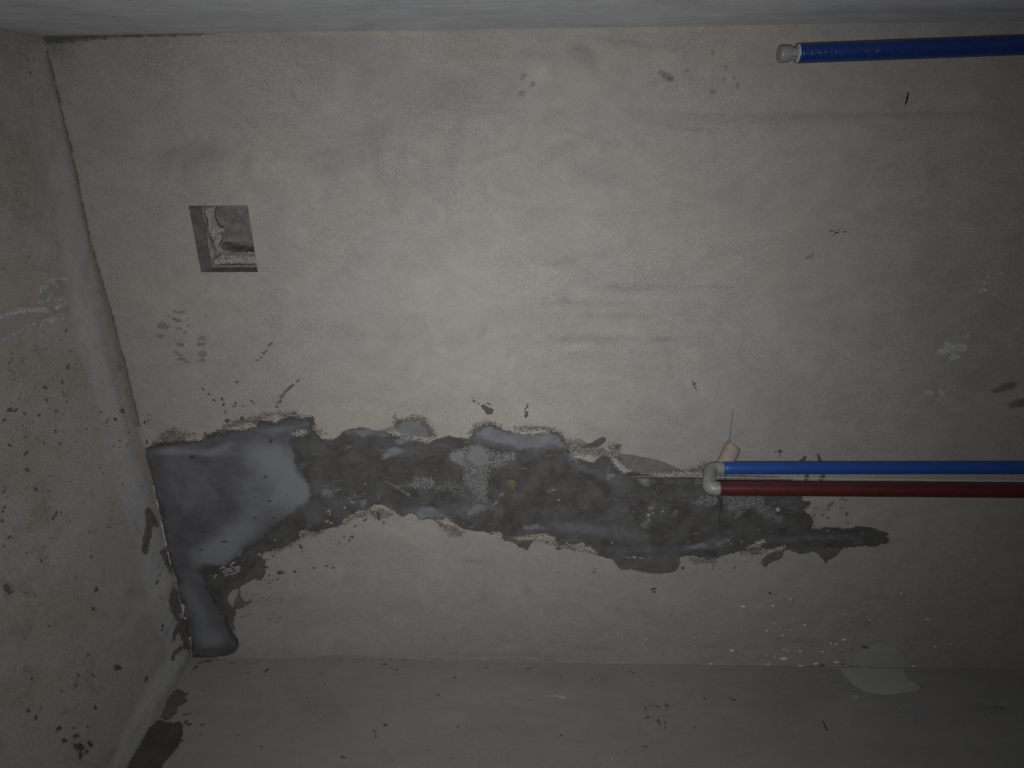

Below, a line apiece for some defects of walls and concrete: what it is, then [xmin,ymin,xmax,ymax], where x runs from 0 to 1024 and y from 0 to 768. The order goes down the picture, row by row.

leakage [141,379,313,660]
flaking render [146,411,890,658]